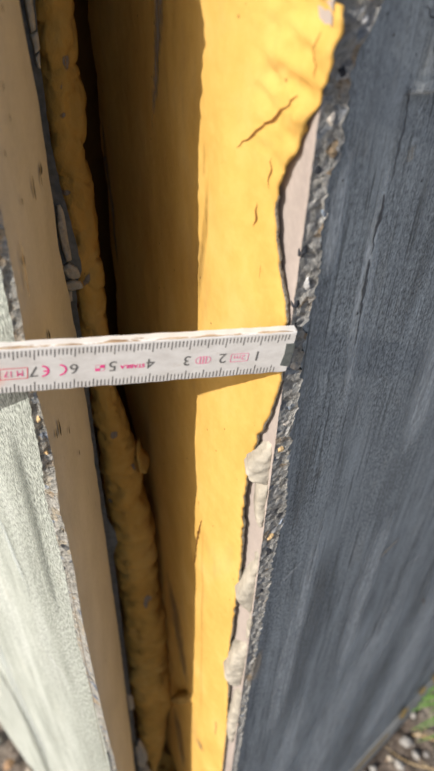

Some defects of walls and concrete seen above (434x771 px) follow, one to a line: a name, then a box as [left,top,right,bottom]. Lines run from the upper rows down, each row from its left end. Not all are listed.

crack [238,95,298,147]